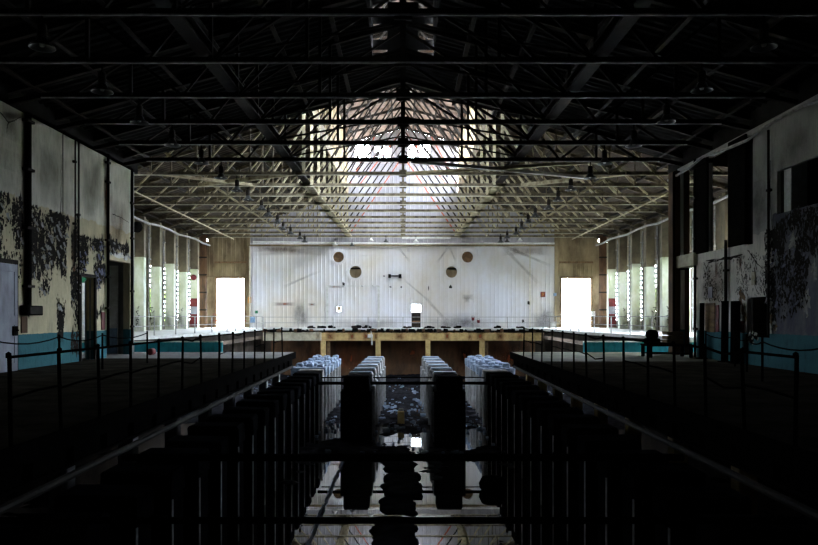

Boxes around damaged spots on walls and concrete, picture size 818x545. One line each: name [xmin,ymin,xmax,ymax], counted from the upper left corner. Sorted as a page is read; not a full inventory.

peeling [0,191,131,358]
peeling [703,204,818,345]